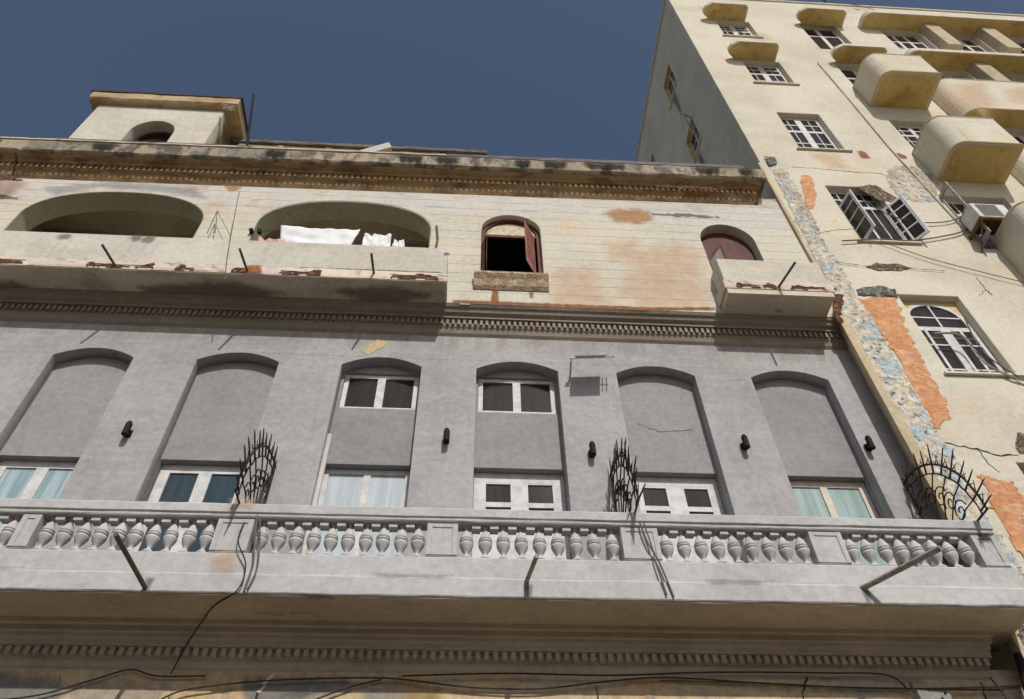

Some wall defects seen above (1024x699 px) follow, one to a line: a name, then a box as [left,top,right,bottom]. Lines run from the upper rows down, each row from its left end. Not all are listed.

spalling [764,156,1024,583]